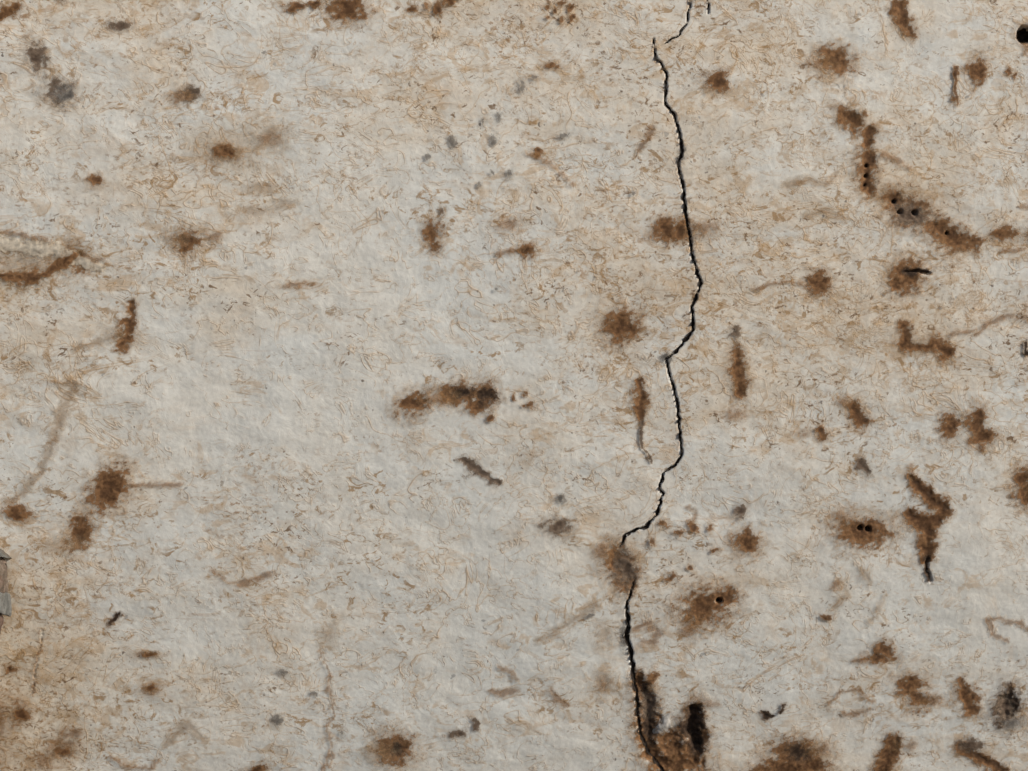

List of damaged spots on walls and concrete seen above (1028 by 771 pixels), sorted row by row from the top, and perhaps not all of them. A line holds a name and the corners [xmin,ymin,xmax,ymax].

rust [989,224,1028,252]
crack [621,0,709,544]
rust [598,306,645,348]
rust [897,314,1028,364]
rust [394,378,505,418]
rust [935,407,999,452]
rust [65,461,181,553]
rust [633,622,661,644]
crack [619,584,664,771]
rust [646,671,660,687]